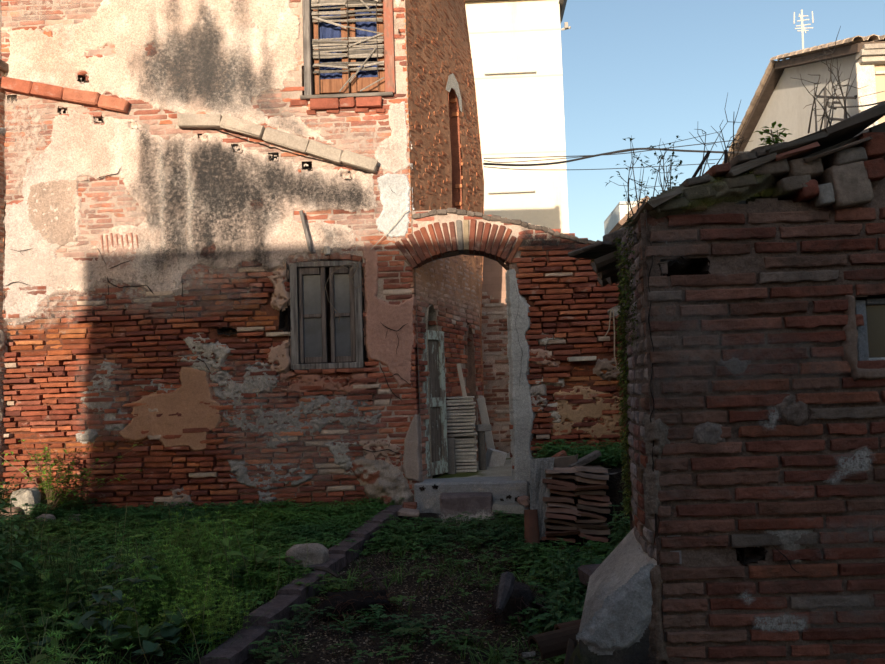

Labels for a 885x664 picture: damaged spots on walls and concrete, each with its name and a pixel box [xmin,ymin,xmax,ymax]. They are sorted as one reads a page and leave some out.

leakage [139,5,270,109]
flaking render [1,0,413,356]
leakage [140,133,370,268]
spalling [0,367,143,471]